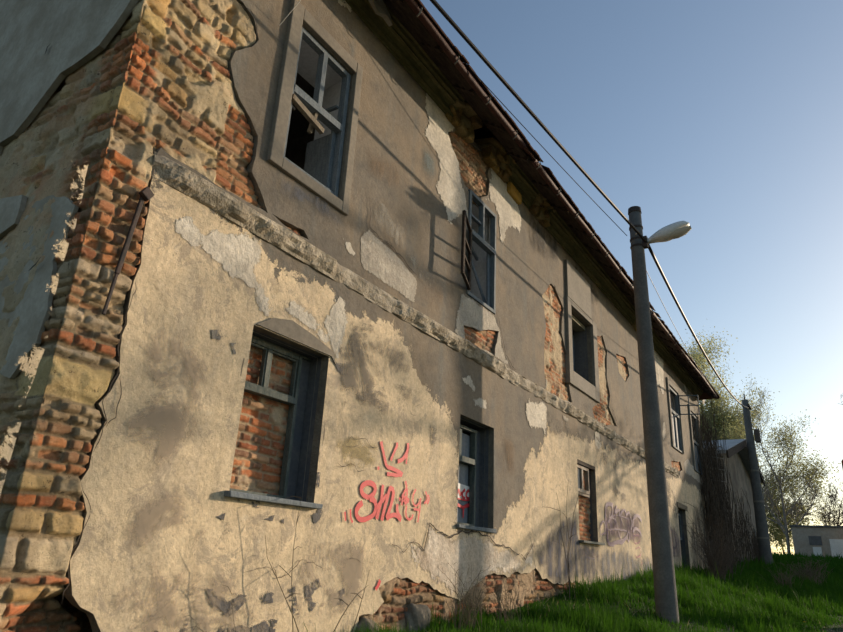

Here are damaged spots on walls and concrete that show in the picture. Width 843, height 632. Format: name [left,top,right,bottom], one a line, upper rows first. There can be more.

crack [93,267,140,452]
peeling [0,0,653,632]
crack [62,483,91,601]
crack [392,523,537,565]
peeling [666,459,711,570]